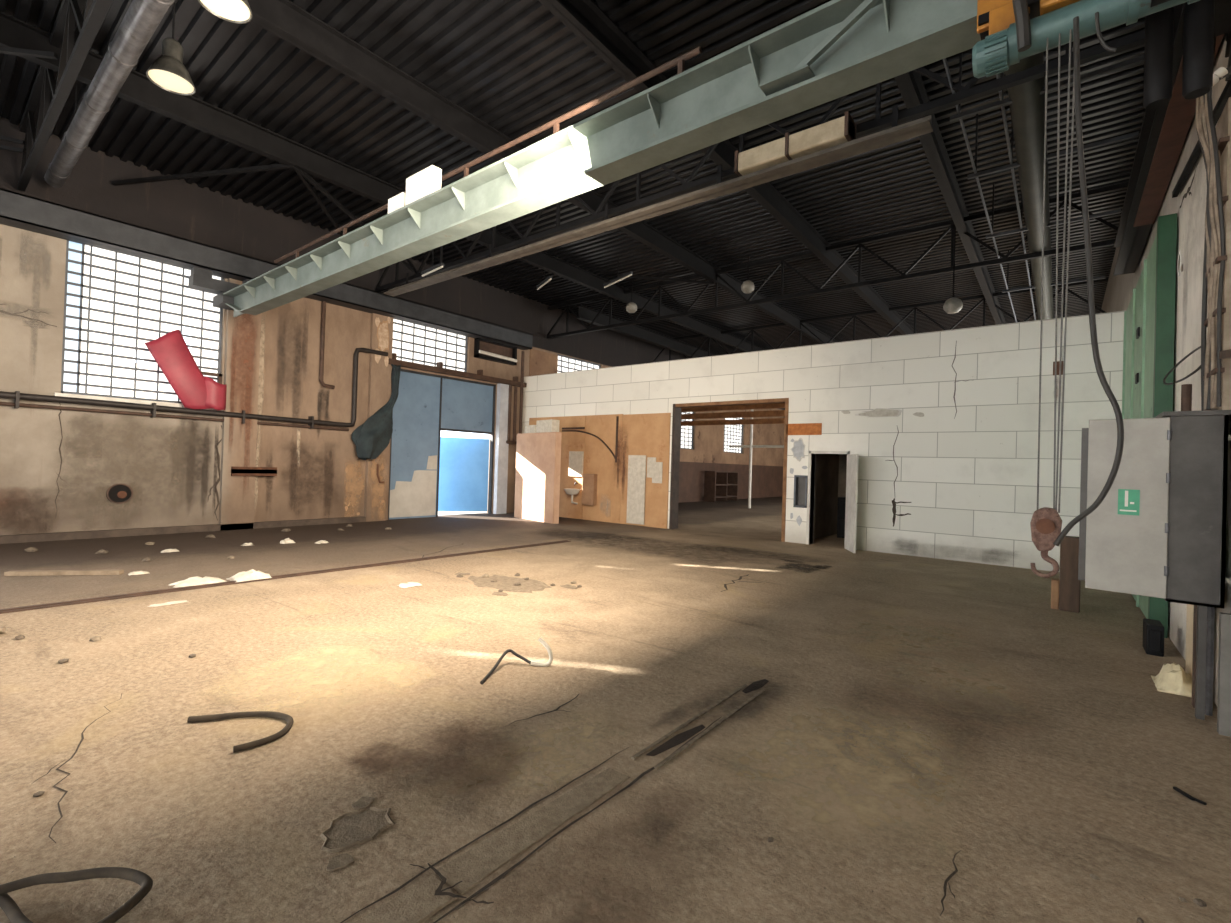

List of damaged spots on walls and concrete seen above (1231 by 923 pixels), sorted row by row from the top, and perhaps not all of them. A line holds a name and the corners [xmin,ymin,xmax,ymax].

leakage [174,421,218,505]
crack [885,427,911,527]
crack [33,694,122,843]
crack [940,850,961,916]